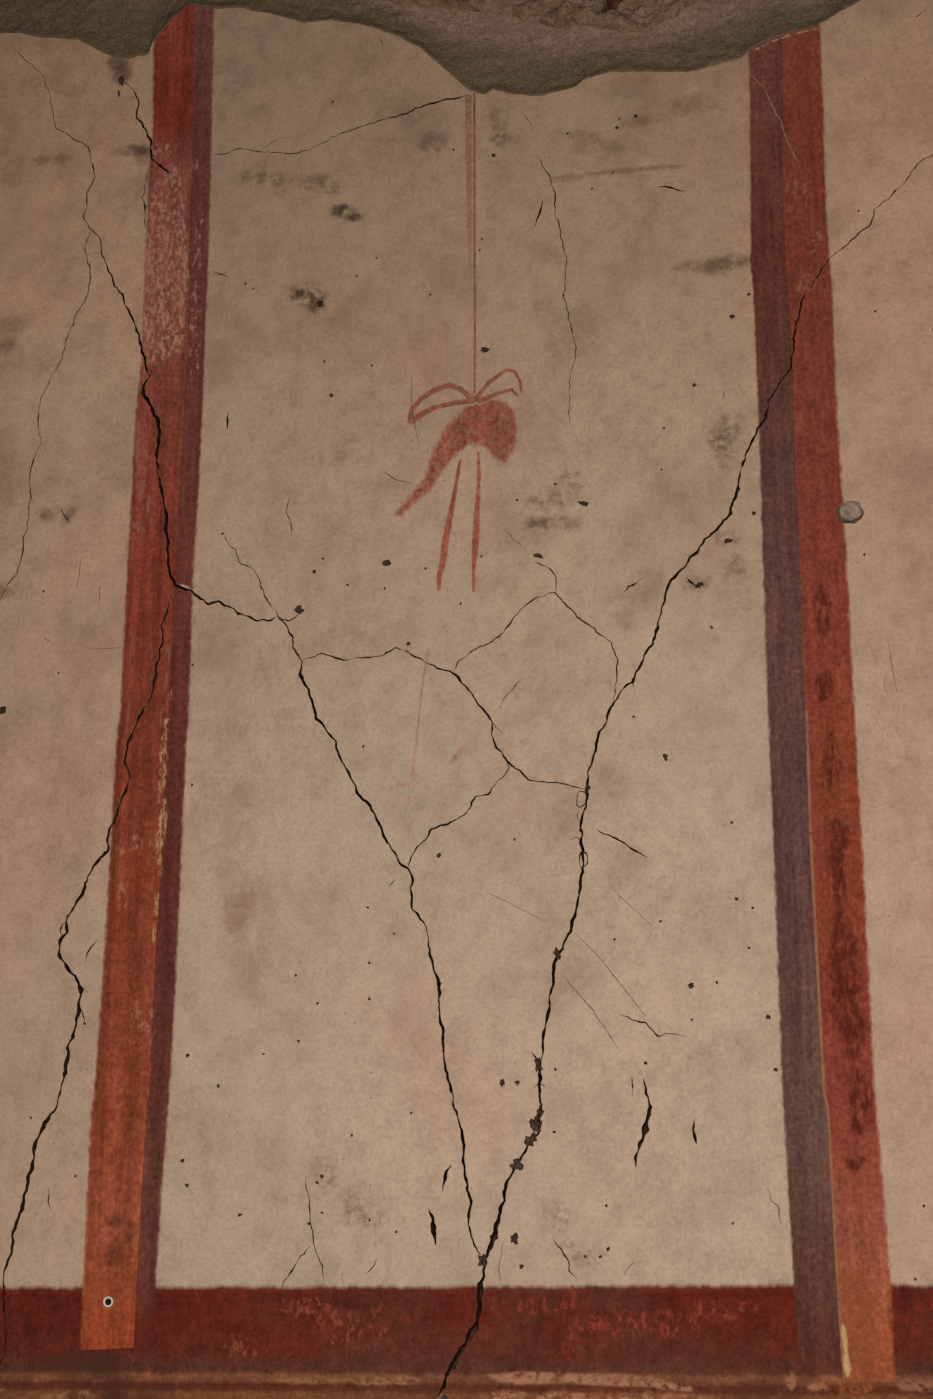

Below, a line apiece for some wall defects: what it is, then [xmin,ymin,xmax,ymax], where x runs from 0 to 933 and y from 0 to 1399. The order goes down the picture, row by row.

crack [217,95,468,155]
flaking render [0,0,866,98]
crack [37,261,91,438]
crack [50,81,276,622]
crack [0,444,41,600]
crack [222,115,933,1395]
crack [0,595,171,1363]